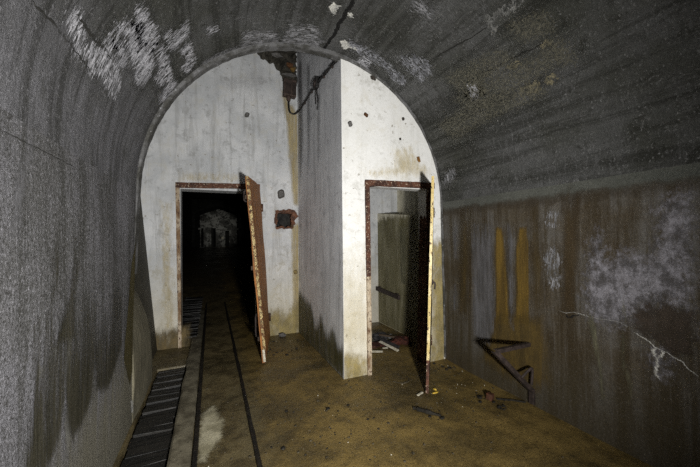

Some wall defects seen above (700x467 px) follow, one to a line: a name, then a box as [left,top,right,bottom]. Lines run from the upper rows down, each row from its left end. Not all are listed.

water stain [27,245,136,467]
crack [560,311,698,380]
water stain [583,191,696,379]